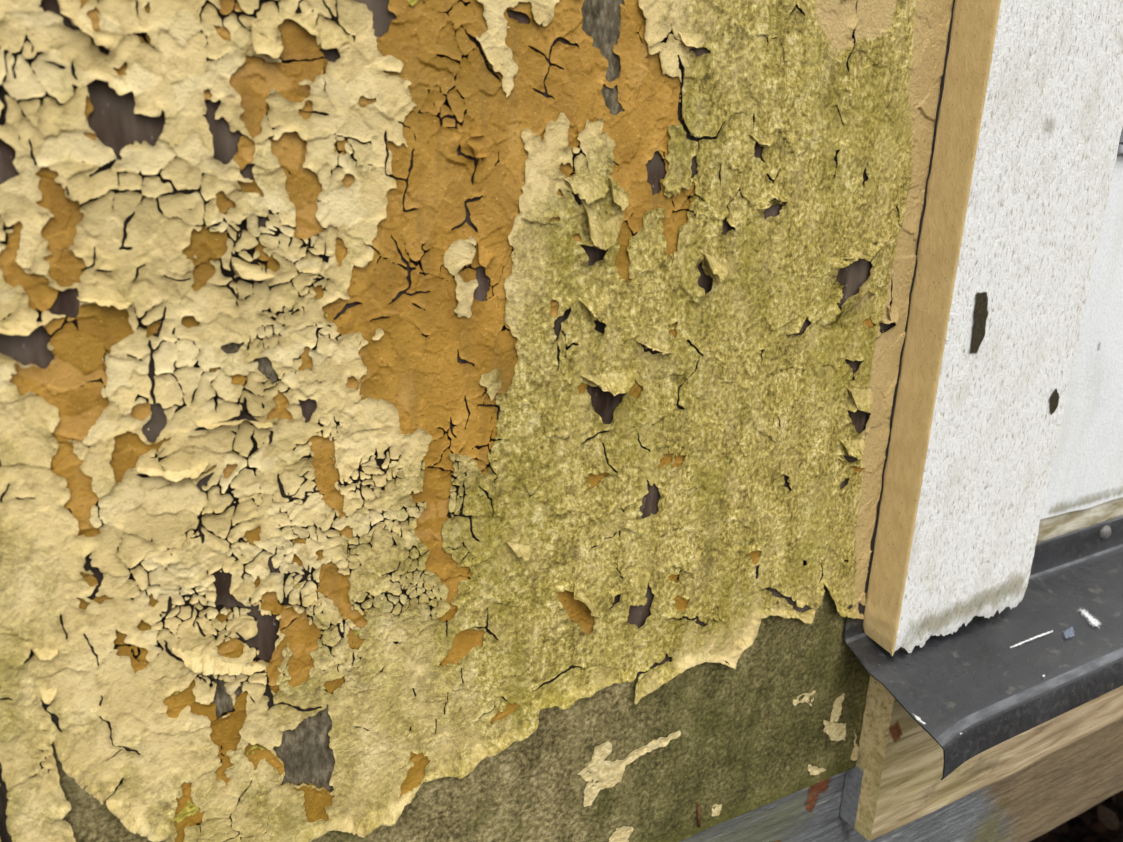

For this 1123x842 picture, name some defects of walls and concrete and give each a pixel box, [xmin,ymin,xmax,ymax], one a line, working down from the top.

crack [0,39,78,126]
crack [81,211,191,282]
crack [127,306,166,403]
crack [333,131,430,321]
peeling [783,234,892,342]
peeling [876,306,900,334]
peeling [0,132,180,681]
crack [195,397,273,431]
peeling [26,0,874,842]
crack [136,461,209,482]
crack [277,473,320,504]
peeling [0,779,21,842]